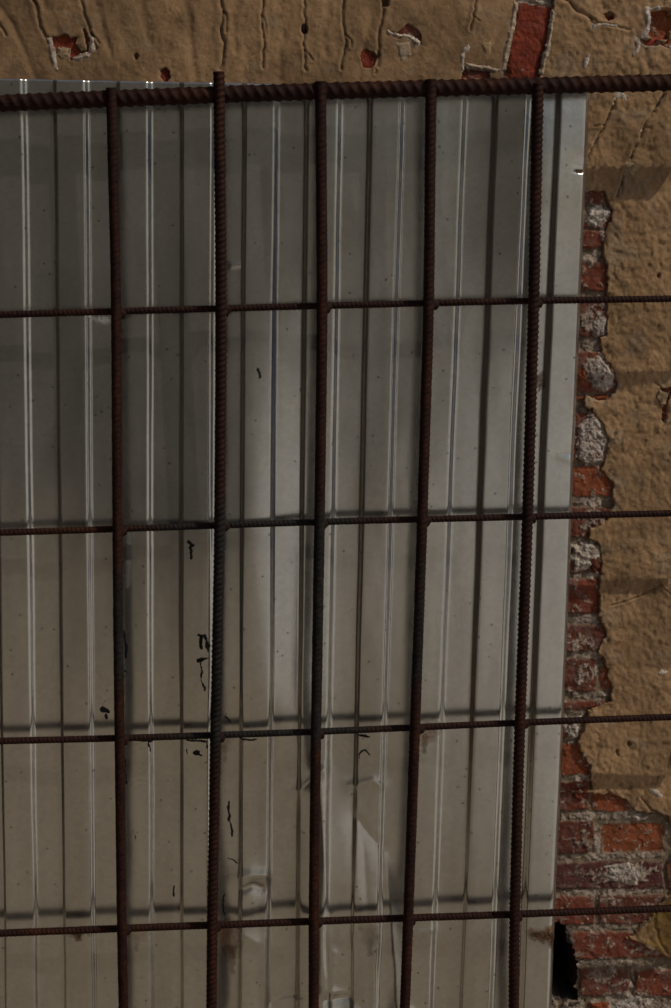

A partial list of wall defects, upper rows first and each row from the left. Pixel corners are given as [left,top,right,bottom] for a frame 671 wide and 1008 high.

spalling [45,29,96,71]
spalling [461,0,556,79]
spalling [632,6,671,57]
spalling [551,191,671,1008]